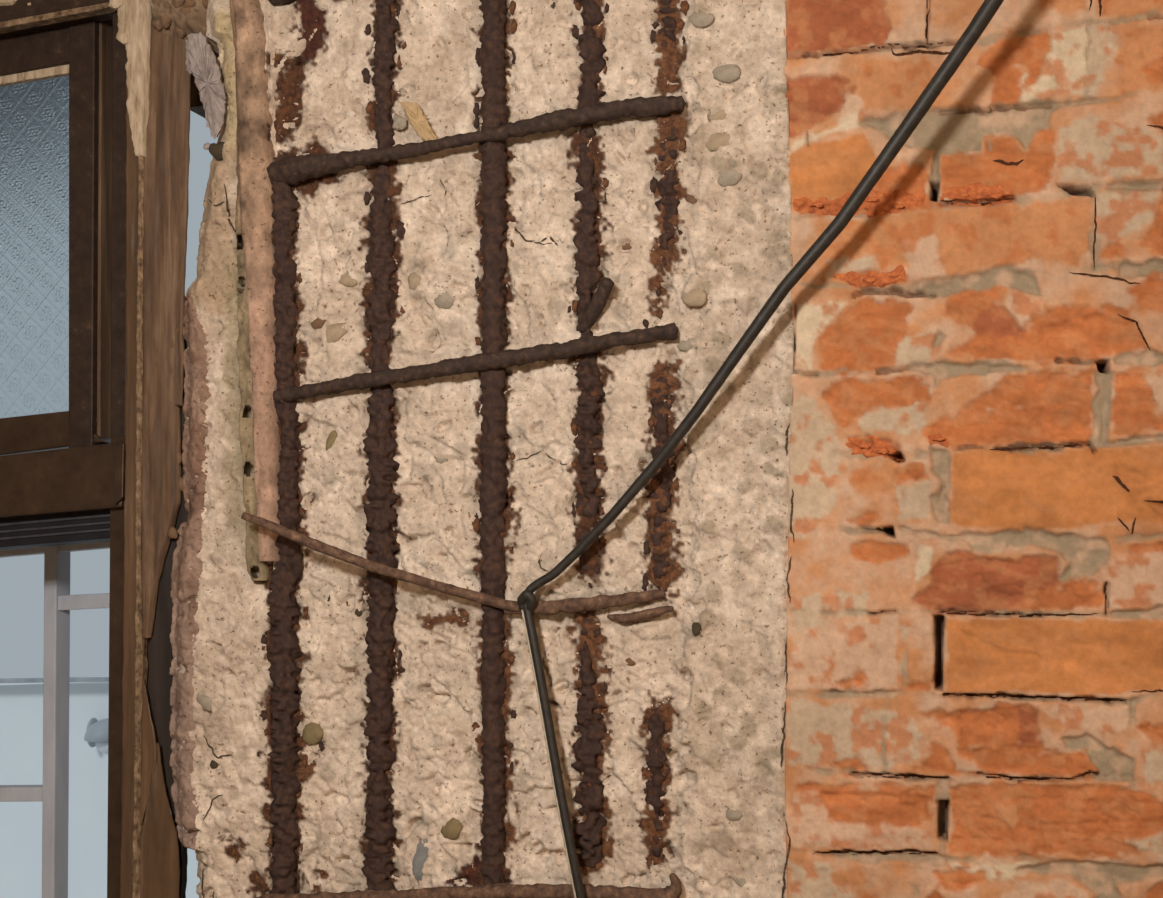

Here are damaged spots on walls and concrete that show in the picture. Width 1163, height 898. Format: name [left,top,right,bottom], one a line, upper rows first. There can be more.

corrosion [264,0,340,157]
corrosion [650,0,689,96]
corrosion [357,160,406,366]
corrosion [642,111,690,328]
spalling [168,294,212,850]
spalling [265,0,711,898]
corrosion [566,351,614,588]
corrosion [639,359,686,598]
crack [1113,476,1163,534]
corrosion [566,610,615,876]
corrosion [633,690,679,869]
crack [946,689,1163,701]